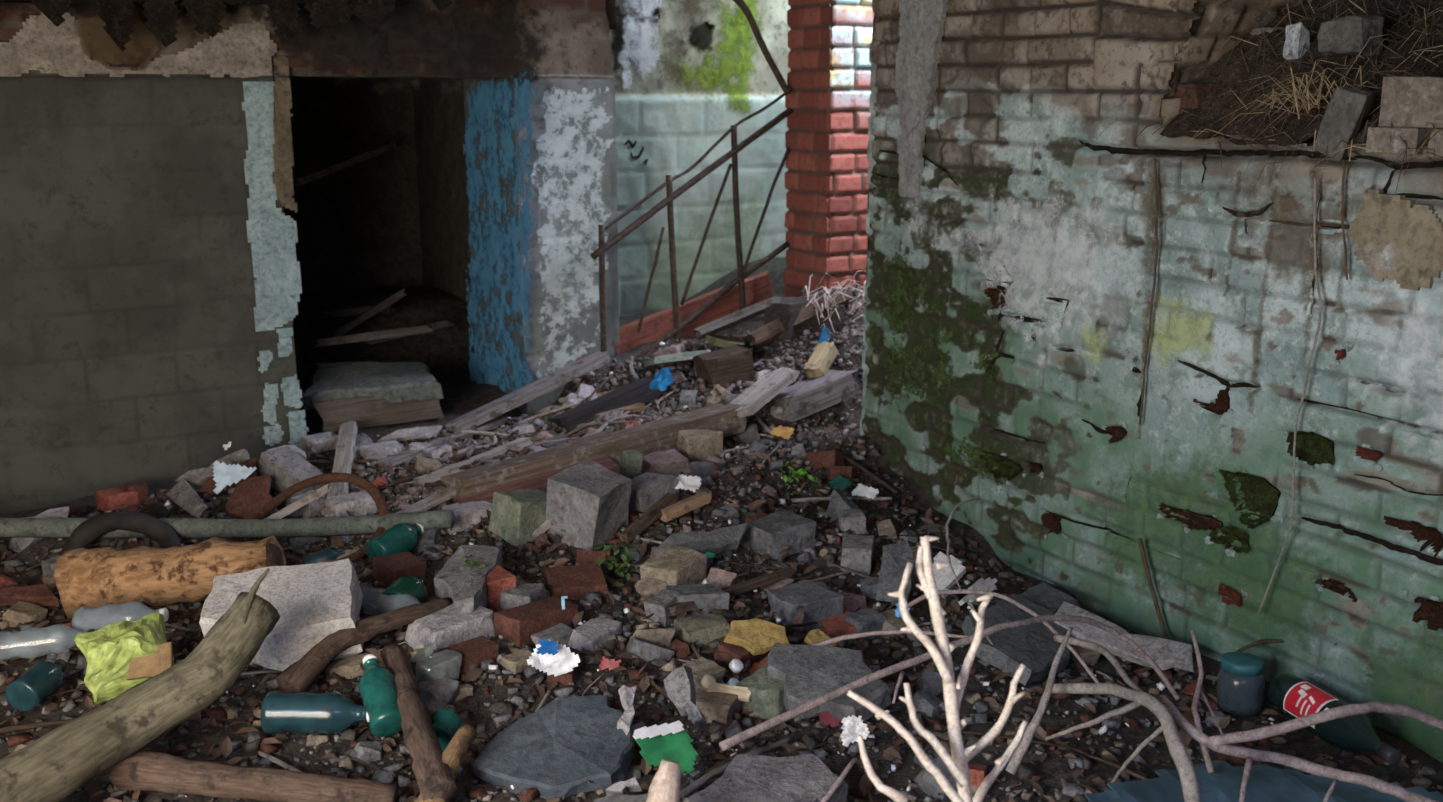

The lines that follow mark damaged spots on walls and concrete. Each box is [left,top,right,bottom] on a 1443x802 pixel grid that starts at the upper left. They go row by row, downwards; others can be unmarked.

leakage [76,17,159,71]
leakage [729,0,757,113]
spalling [1173,83,1213,112]
peeling [463,67,615,394]
leakage [972,202,1101,338]
leakage [1230,172,1361,313]
leakage [1250,312,1262,406]
spalling [1156,469,1285,557]
crack [1301,517,1443,566]
crack [1354,474,1443,496]
spalling [1400,589,1443,636]